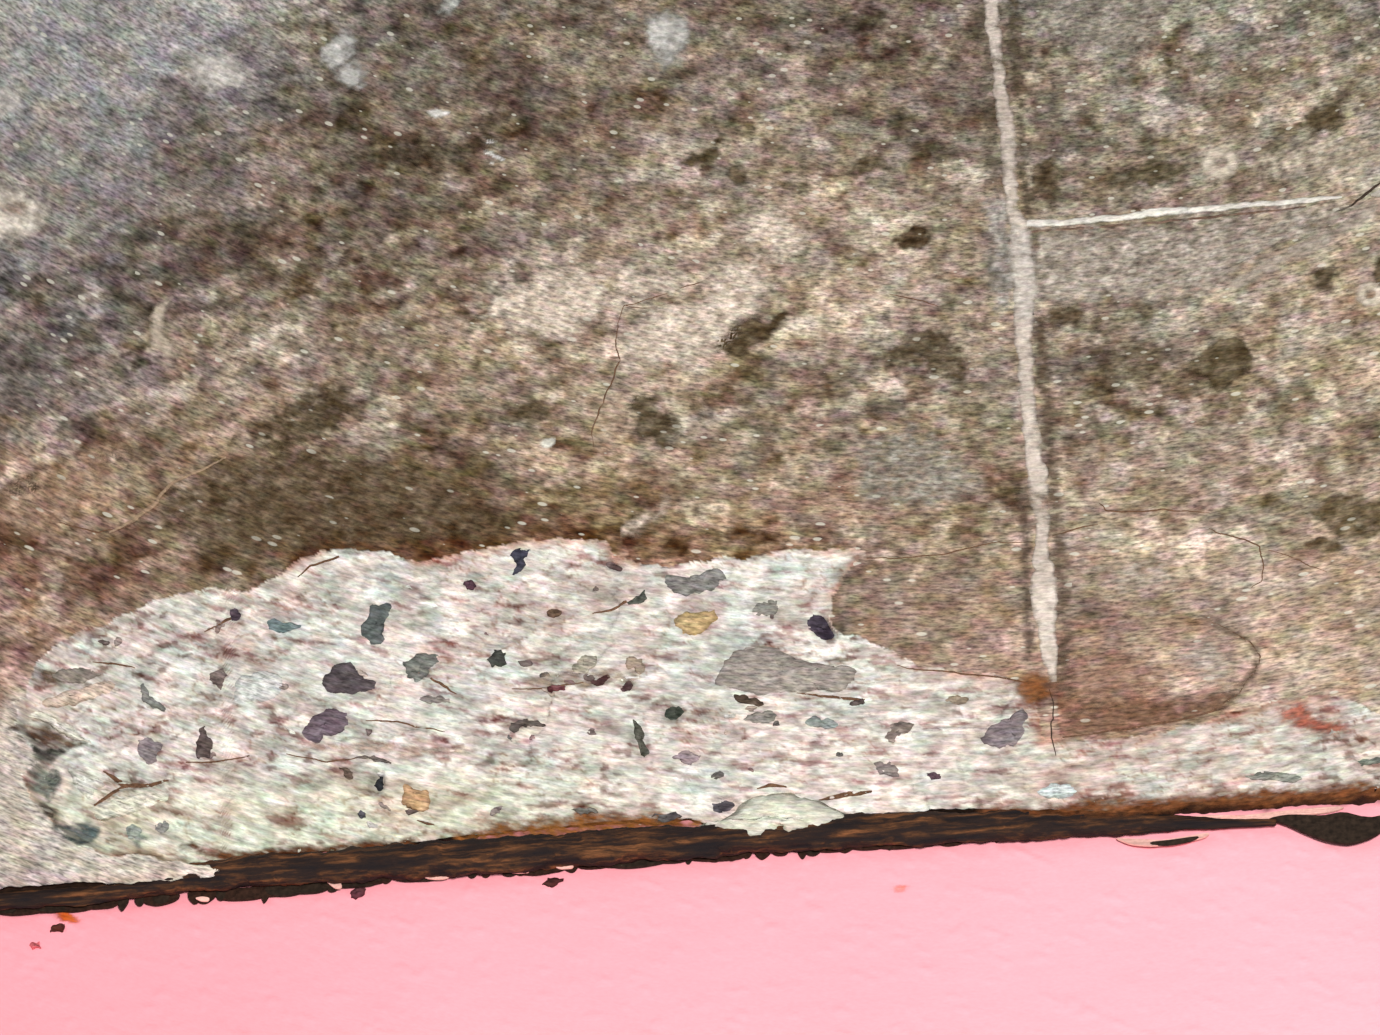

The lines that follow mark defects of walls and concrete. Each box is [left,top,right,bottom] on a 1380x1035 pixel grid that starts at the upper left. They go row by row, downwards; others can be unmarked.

crack [1199,183,1380,286]
spalling [9,538,1380,866]
rust [1017,672,1050,705]
rust [0,781,1380,922]